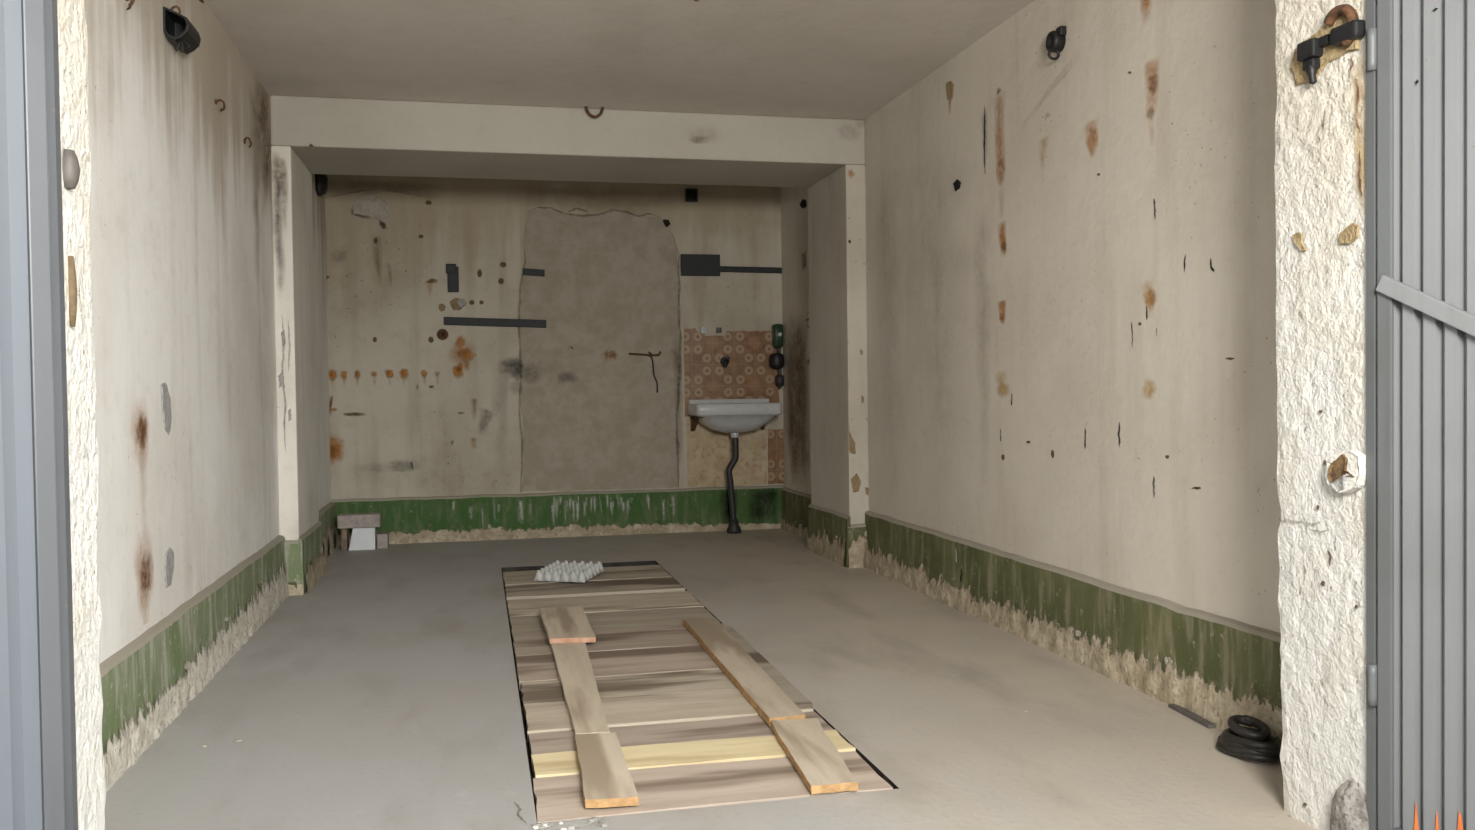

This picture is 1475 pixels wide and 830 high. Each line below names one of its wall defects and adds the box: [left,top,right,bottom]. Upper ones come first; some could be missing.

rust [453,338,471,377]
rust [329,369,427,414]
flaking render [1323,449,1366,494]
flaking render [164,547,174,588]
flaking render [376,517,1283,740]
flaking render [103,559,303,792]